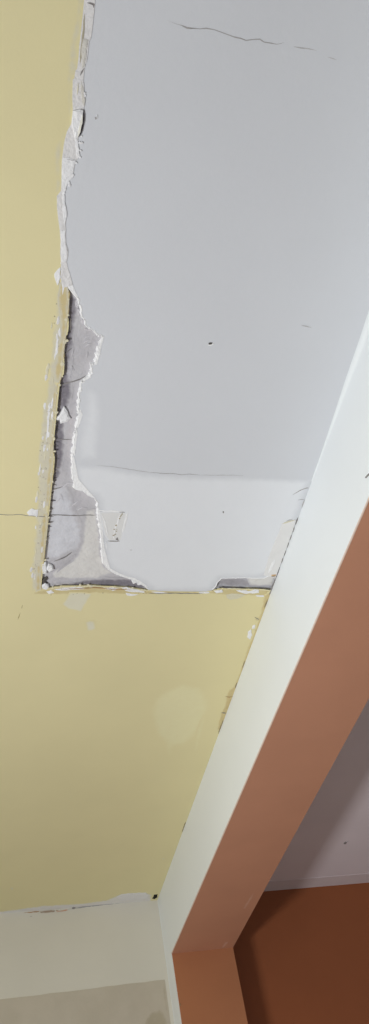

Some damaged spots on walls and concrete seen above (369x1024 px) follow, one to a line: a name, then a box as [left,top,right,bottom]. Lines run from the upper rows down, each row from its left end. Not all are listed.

flaking render [27,0,369,731]
crack [170,21,336,60]